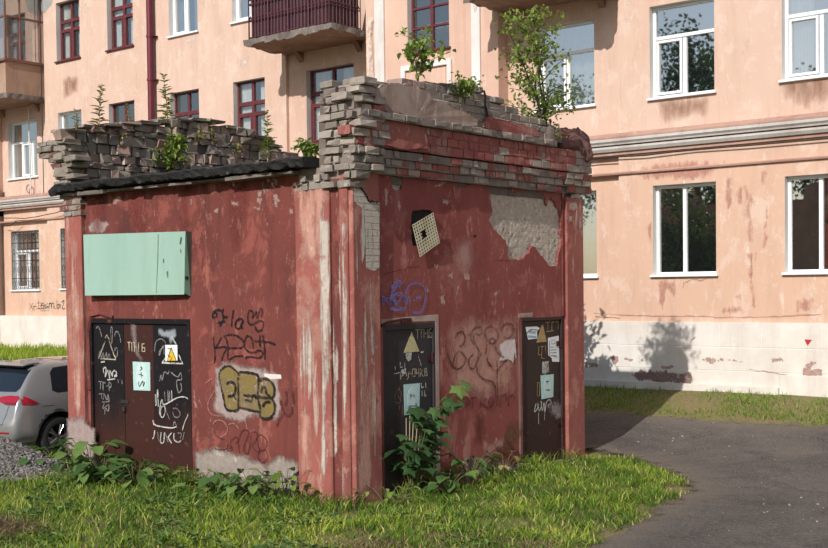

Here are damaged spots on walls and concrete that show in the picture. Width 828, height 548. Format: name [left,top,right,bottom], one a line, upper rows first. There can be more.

peeling [254,178,280,211]
spalling [353,185,401,280]
spalling [489,194,559,266]
flaking render [195,188,347,497]
peeling [358,283,376,491]
peeling [803,362,822,376]